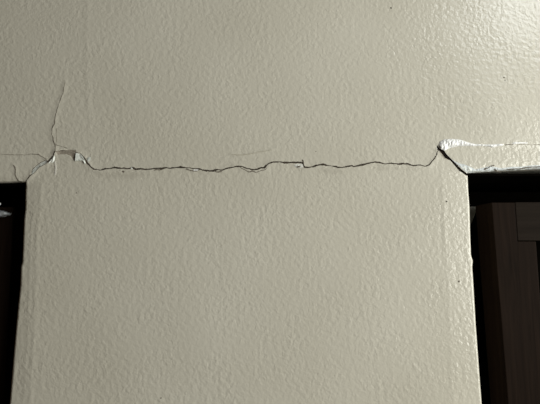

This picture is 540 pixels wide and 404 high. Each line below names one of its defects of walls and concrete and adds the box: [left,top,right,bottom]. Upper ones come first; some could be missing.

crack [2,83,468,182]
peeling [439,139,504,151]
spalling [56,149,91,164]
spalling [454,161,540,173]